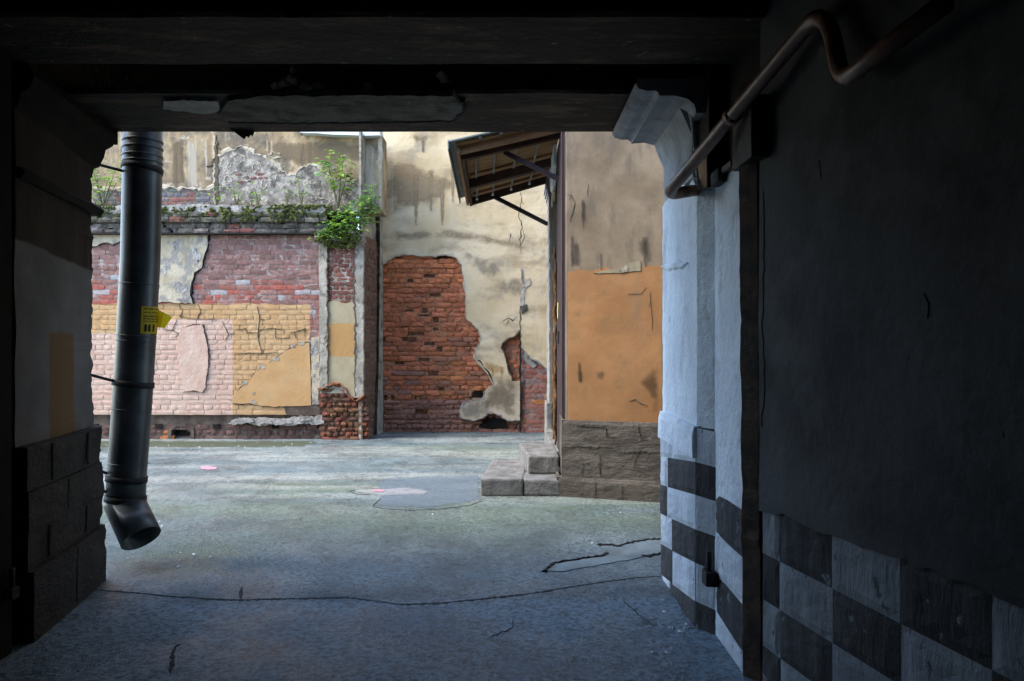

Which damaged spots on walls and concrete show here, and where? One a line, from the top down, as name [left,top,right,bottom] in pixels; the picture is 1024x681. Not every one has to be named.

spalling [92,186,121,206]
spalling [162,145,377,212]
water stain [392,164,511,244]
crack [509,193,525,250]
peeling [158,235,210,304]
crack [162,247,357,394]
spalling [383,254,547,432]
spalling [233,337,370,440]